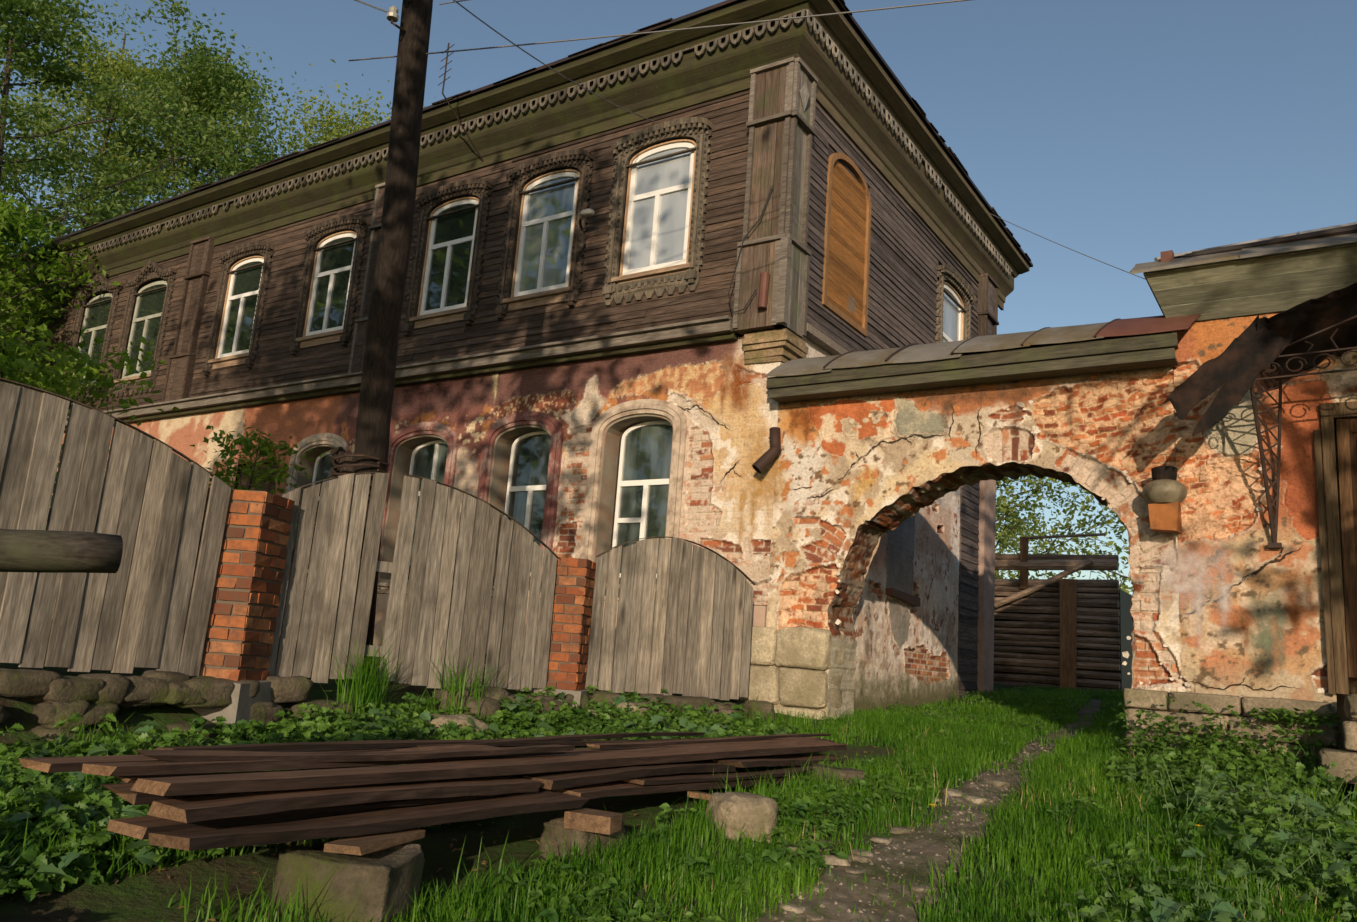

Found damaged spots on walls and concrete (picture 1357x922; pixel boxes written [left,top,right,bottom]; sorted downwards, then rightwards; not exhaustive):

flaking render [491,361,771,565]
peeling [805,397,910,457]
crack [791,404,983,499]
peeling [1275,365,1357,540]
spalling [745,516,846,630]
spalling [868,579,883,601]
spalling [983,360,1265,692]
damp [1167,552,1229,612]
spalling [892,637,950,684]
spalling [1311,665,1328,693]